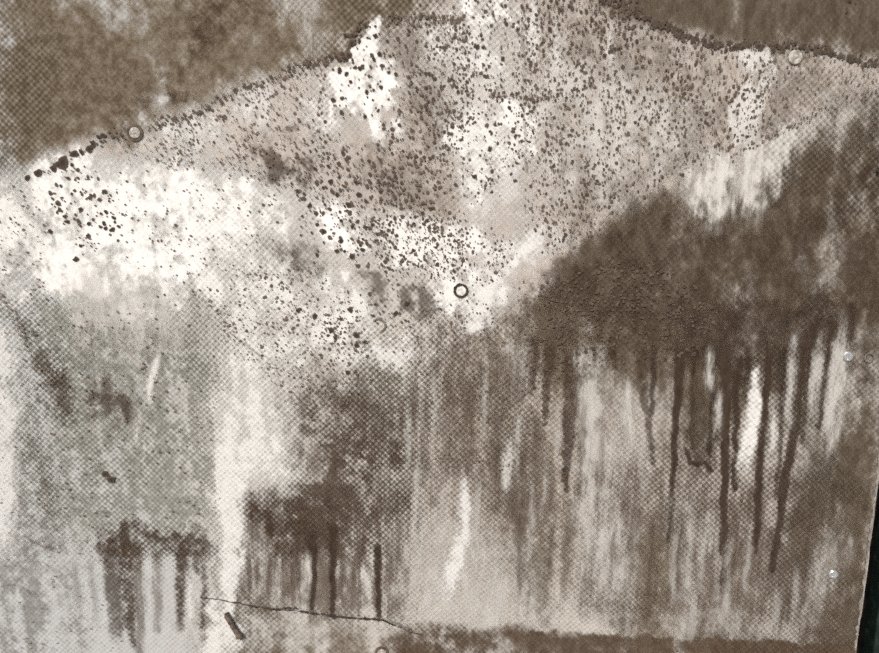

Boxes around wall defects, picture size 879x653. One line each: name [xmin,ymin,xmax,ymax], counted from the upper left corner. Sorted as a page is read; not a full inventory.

crack [200,597,420,635]